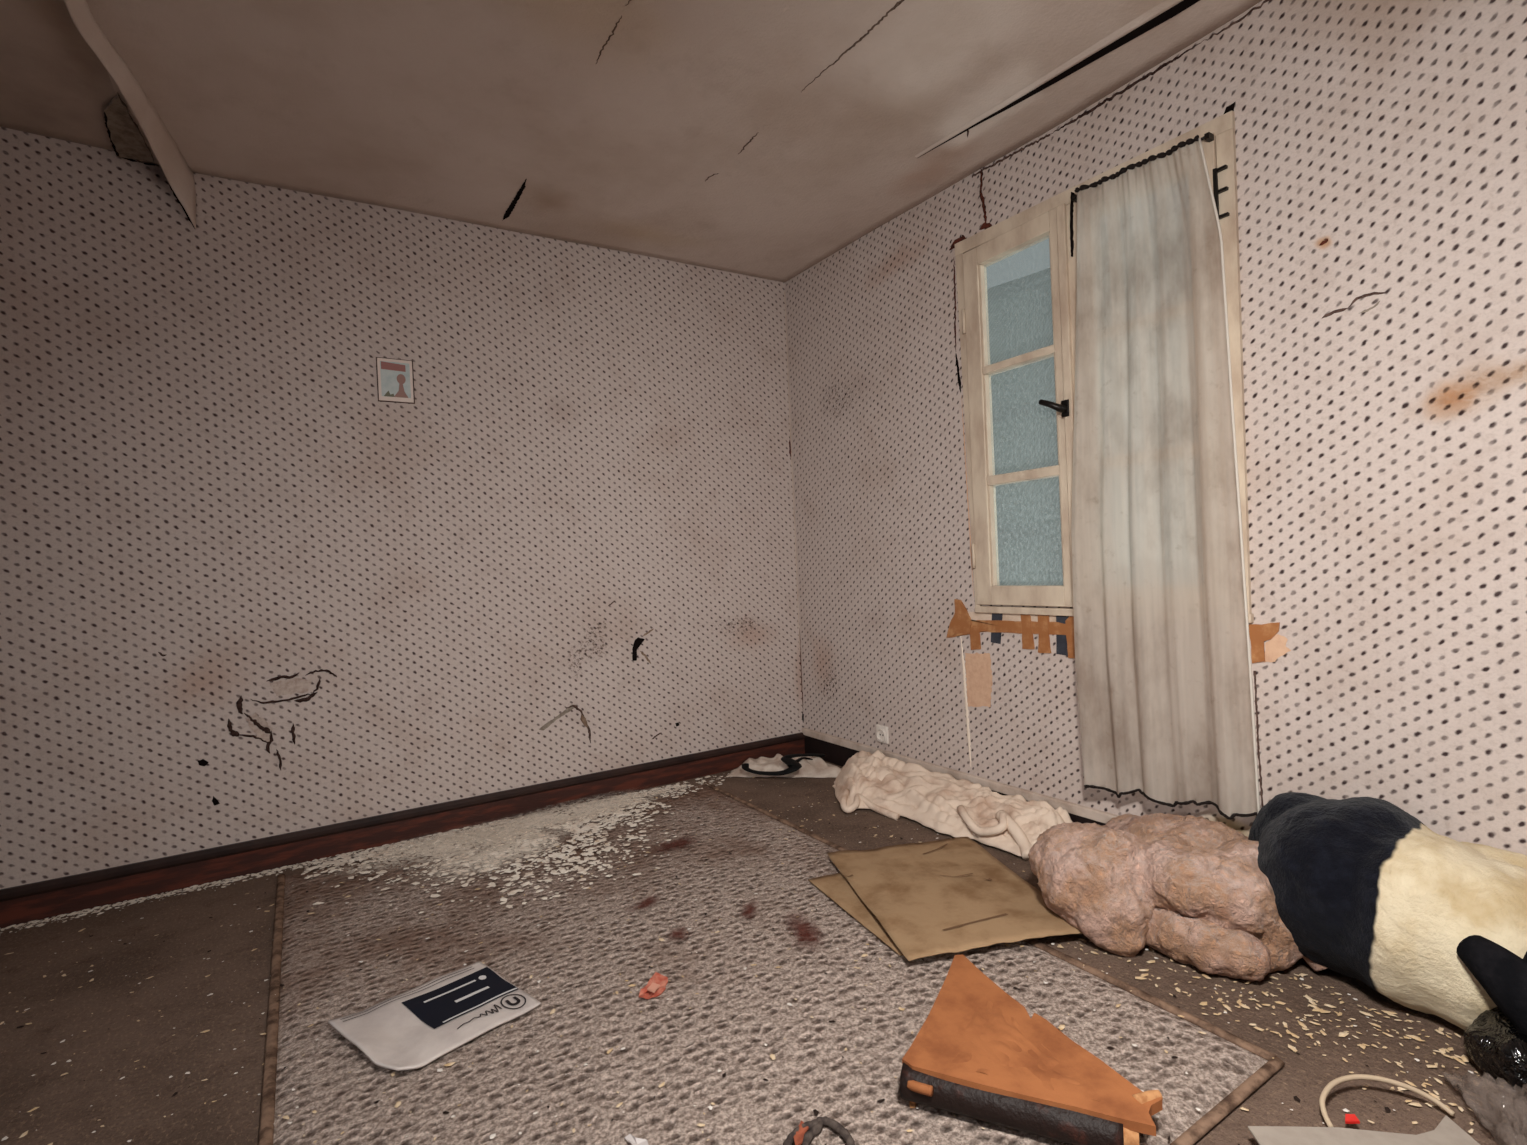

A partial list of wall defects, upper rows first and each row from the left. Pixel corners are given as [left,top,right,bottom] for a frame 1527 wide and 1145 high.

crack [596,0,631,64]
crack [801,0,904,93]
crack [950,0,1270,247]